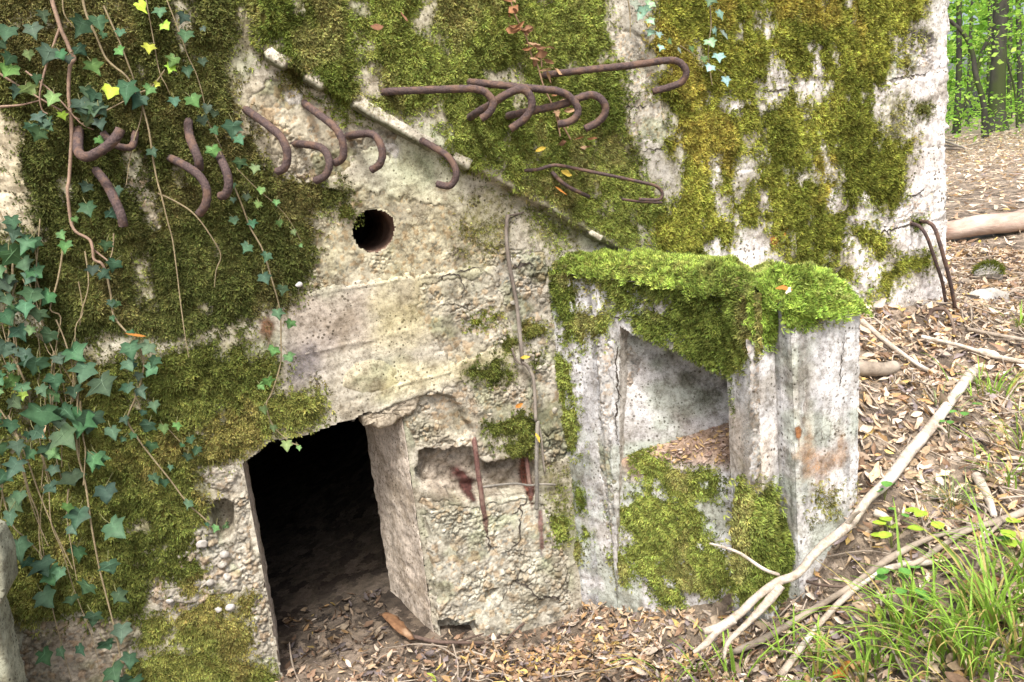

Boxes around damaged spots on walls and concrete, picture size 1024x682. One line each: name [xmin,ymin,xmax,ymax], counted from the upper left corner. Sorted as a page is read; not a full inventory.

spalling [300,186,572,636]
crack [613,346,621,444]
rust [451,466,476,501]
crack [486,496,571,602]
rust [519,456,544,548]